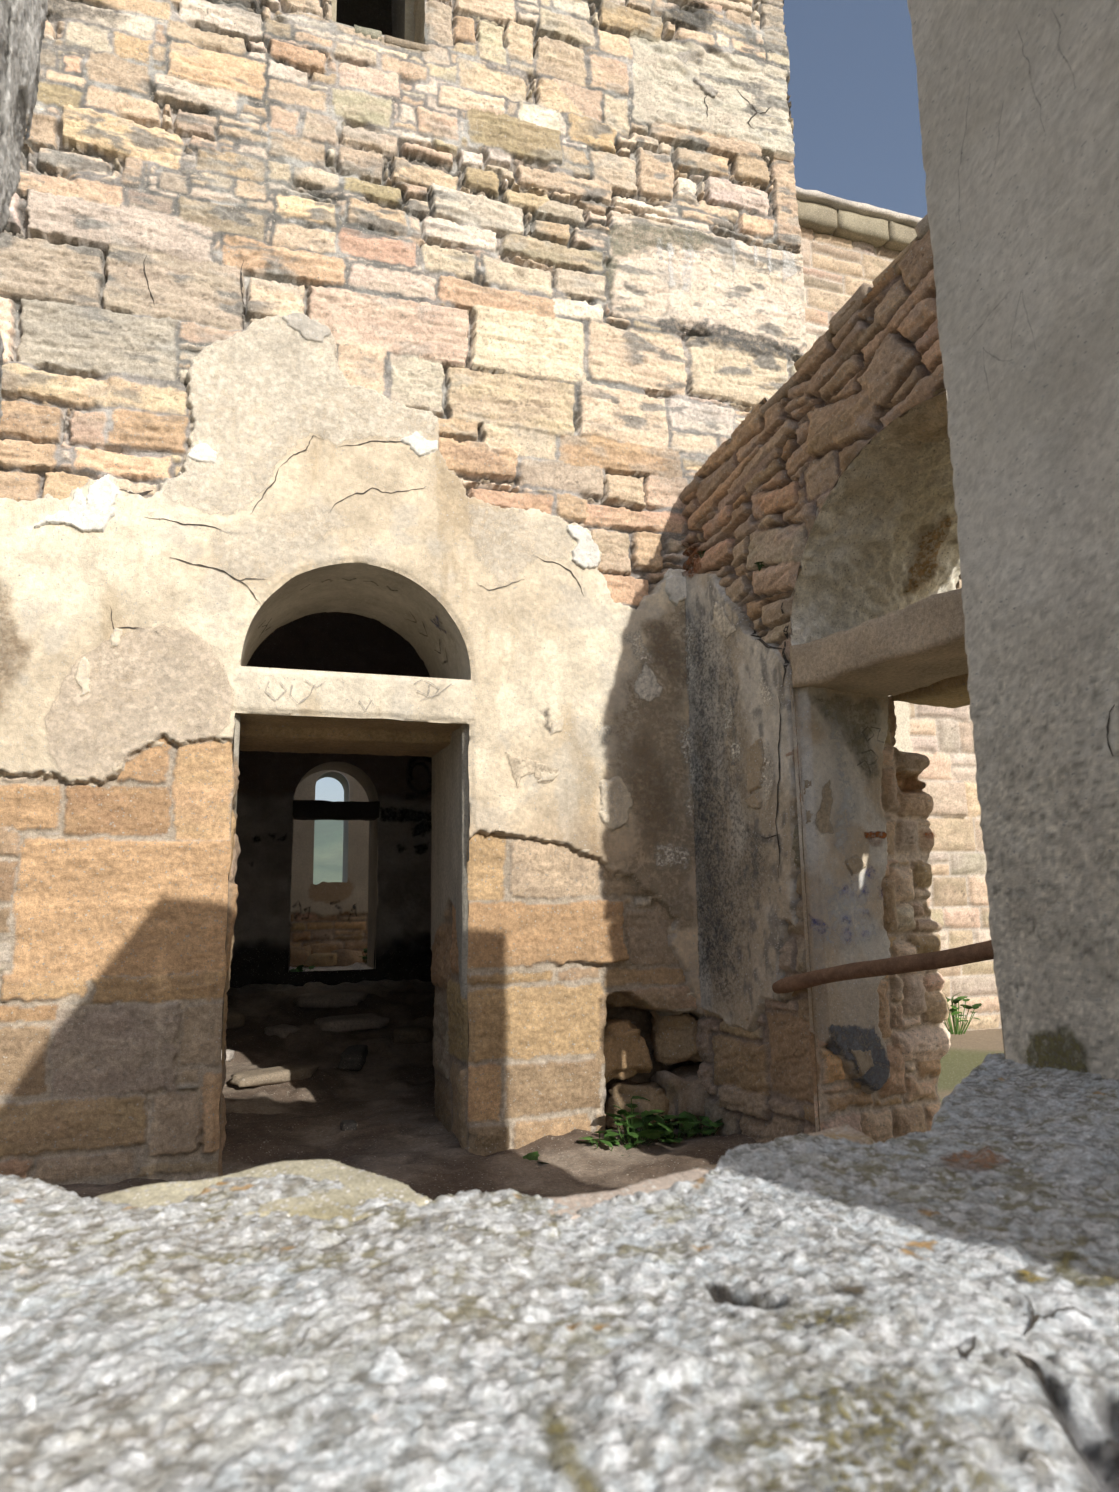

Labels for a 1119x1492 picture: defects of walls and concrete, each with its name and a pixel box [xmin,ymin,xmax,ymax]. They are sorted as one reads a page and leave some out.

flaking render [164,312,438,514]
flaking render [33,474,119,533]
crack [119,435,401,607]
crack [329,486,426,513]
flaking render [566,525,601,570]
leakage [0,594,29,696]
flaking render [627,632,662,701]
flaking render [599,764,634,832]
leakage [615,605,763,990]
spalling [0,626,234,1185]
spalling [467,829,710,1156]